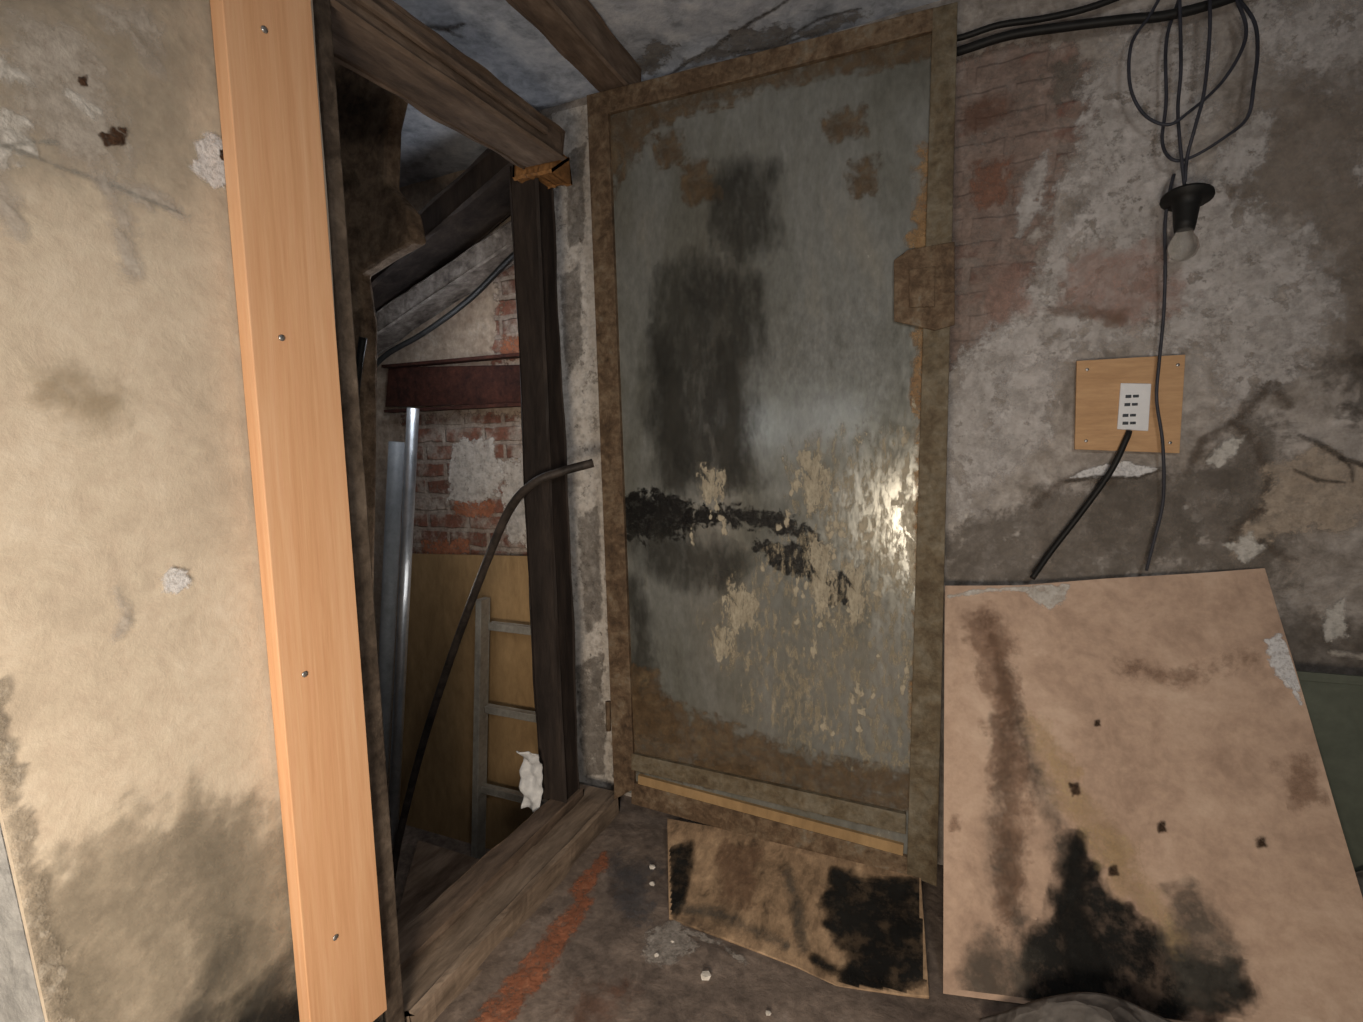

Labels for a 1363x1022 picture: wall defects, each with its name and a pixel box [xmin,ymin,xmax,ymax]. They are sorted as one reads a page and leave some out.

peeling [696,463,728,535]
peeling [1206,437,1243,468]
peeling [1224,446,1363,563]
peeling [711,426,920,776]
spalling [0,681,75,1022]
damp [26,800,300,1022]
damp [642,842,748,966]
damp [783,868,927,992]
damp [966,831,1256,1021]